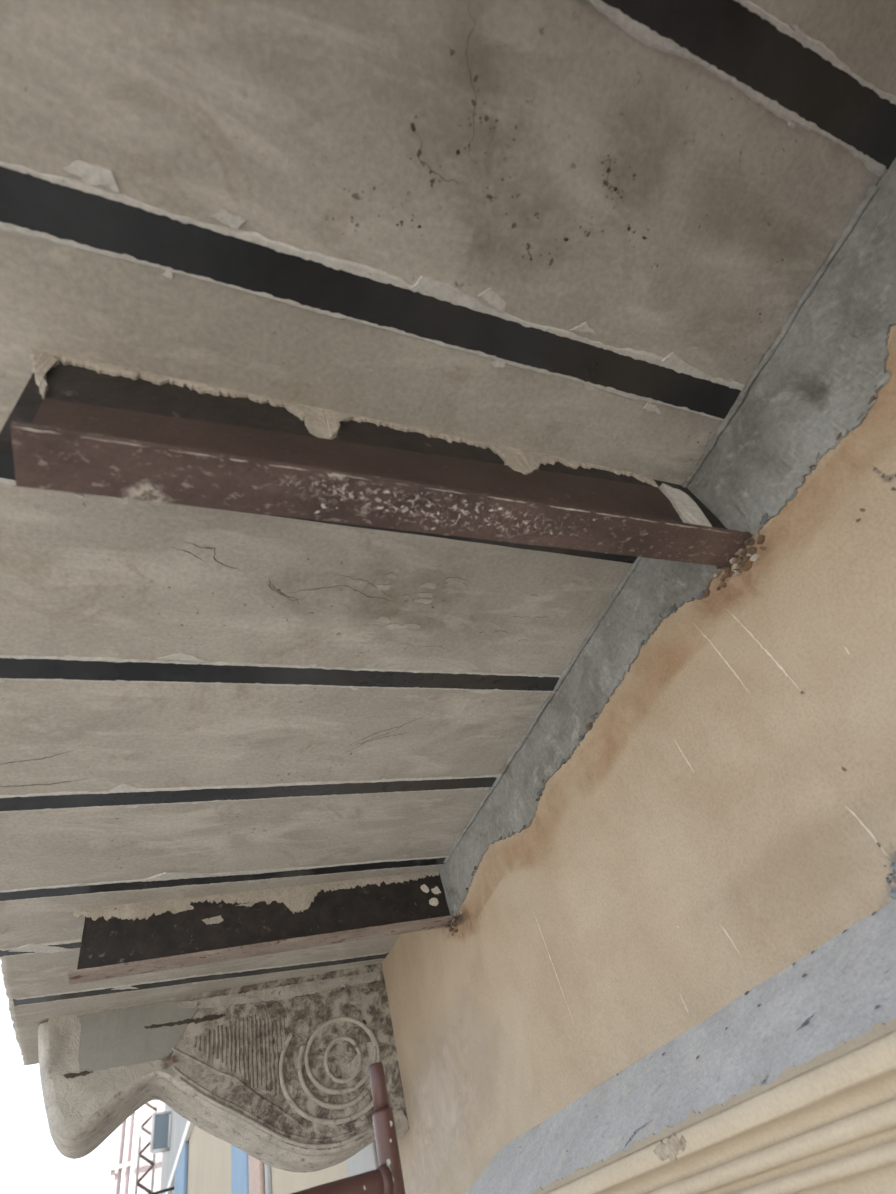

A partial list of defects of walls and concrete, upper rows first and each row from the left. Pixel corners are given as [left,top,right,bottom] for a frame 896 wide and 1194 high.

peeling [411,276,506,312]
peeling [30,348,60,399]
peeling [661,352,725,384]
peeling [285,401,356,440]
peeling [503,447,554,475]
peeling [272,465,559,534]
peeling [551,506,727,533]
crack [175,542,239,570]
spalling [695,513,769,600]
crack [269,574,394,605]
peeling [420,884,441,906]
peeling [202,915,223,925]